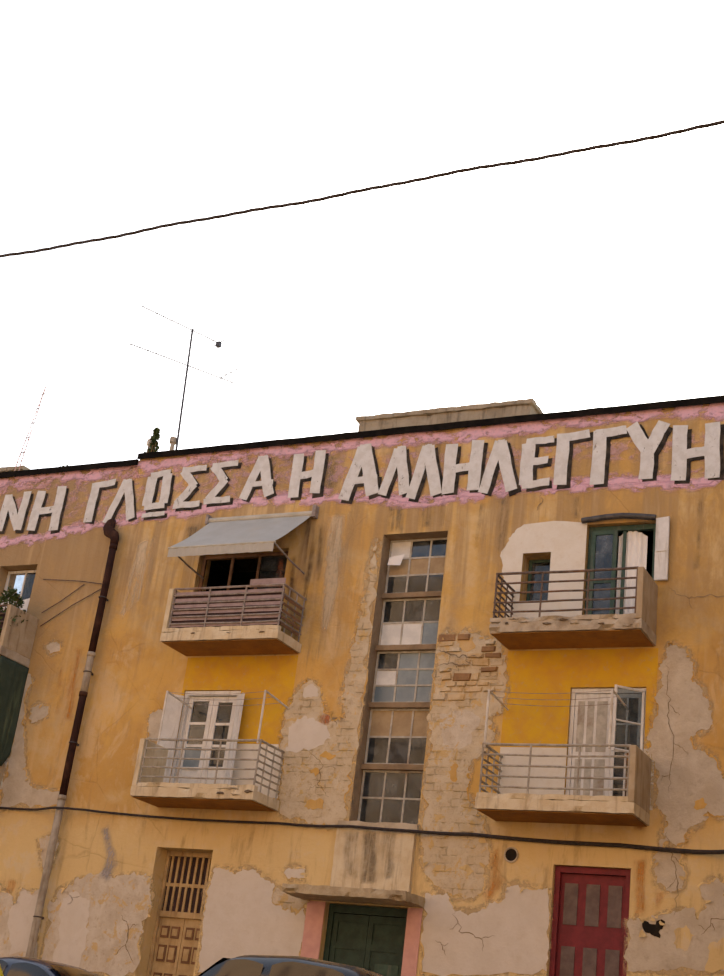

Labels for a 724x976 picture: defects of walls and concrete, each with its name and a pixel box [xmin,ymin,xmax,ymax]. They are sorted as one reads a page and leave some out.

peeling [0,673,60,810]
peeling [0,870,154,976]
peeling [277,538,382,831]
spalling [419,627,510,901]
crack [436,911,493,955]
peeling [624,641,724,976]